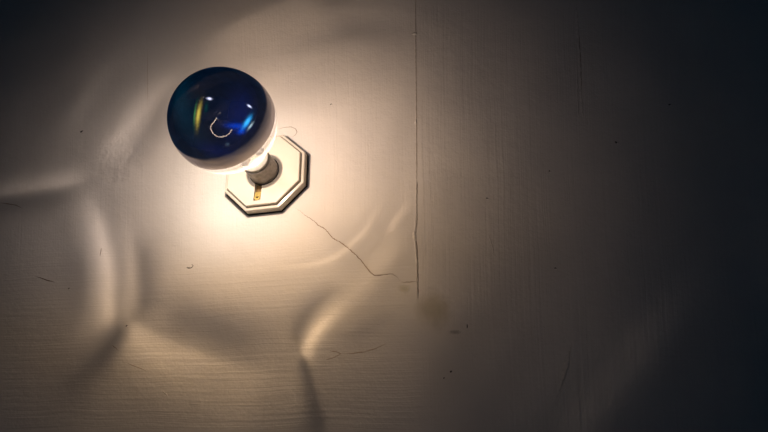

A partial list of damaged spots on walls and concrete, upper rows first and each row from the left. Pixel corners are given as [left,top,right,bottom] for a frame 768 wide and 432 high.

crack [294,0,419,298]